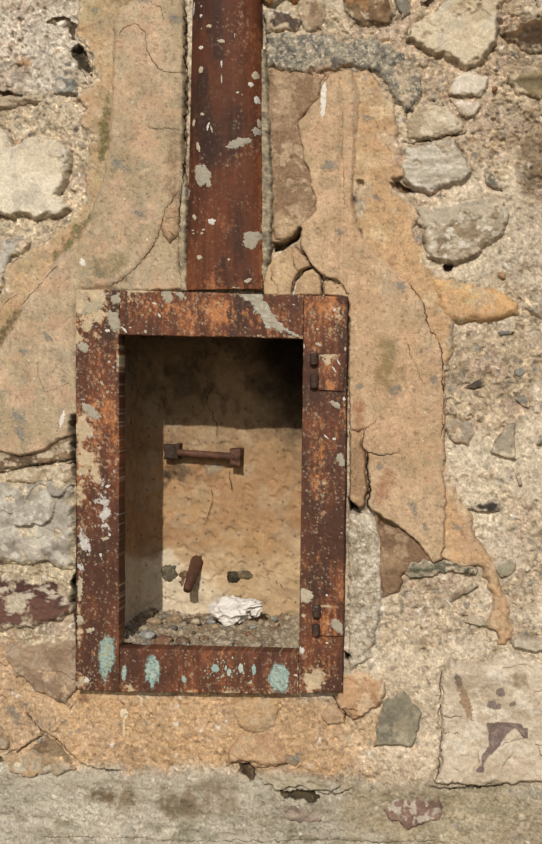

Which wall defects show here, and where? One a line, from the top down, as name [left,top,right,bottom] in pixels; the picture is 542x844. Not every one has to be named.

crack [112,4,189,285]
crack [411,285,445,435]
crack [352,420,394,508]
crack [6,714,118,772]